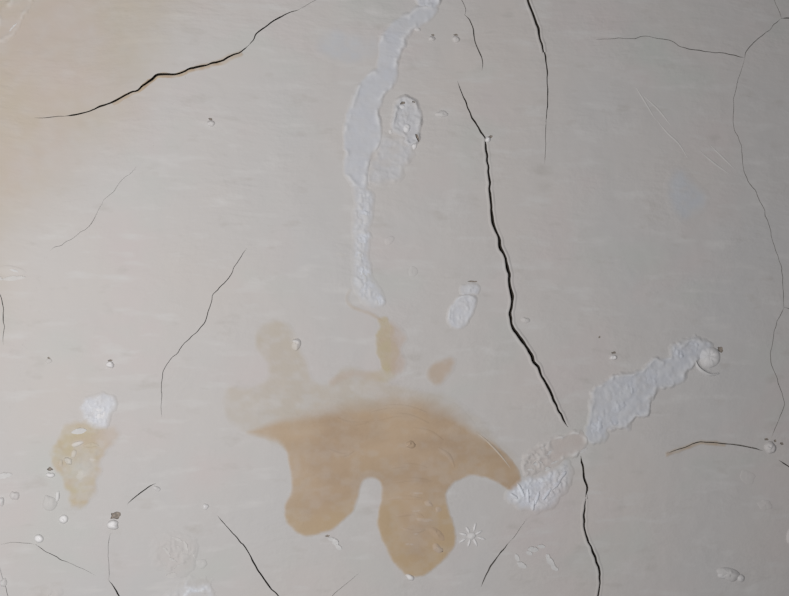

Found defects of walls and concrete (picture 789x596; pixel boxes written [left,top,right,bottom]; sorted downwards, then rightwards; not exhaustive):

crack [45,0,315,118]
peeling [388,94,424,150]
crack [524,0,548,153]
crack [161,251,245,415]
leakage [221,0,575,578]
crack [458,84,570,428]
crack [596,0,789,433]
leakage [47,391,122,511]
crack [669,441,763,453]
crack [220,519,279,596]
crack [481,523,524,586]
crack [580,458,604,596]